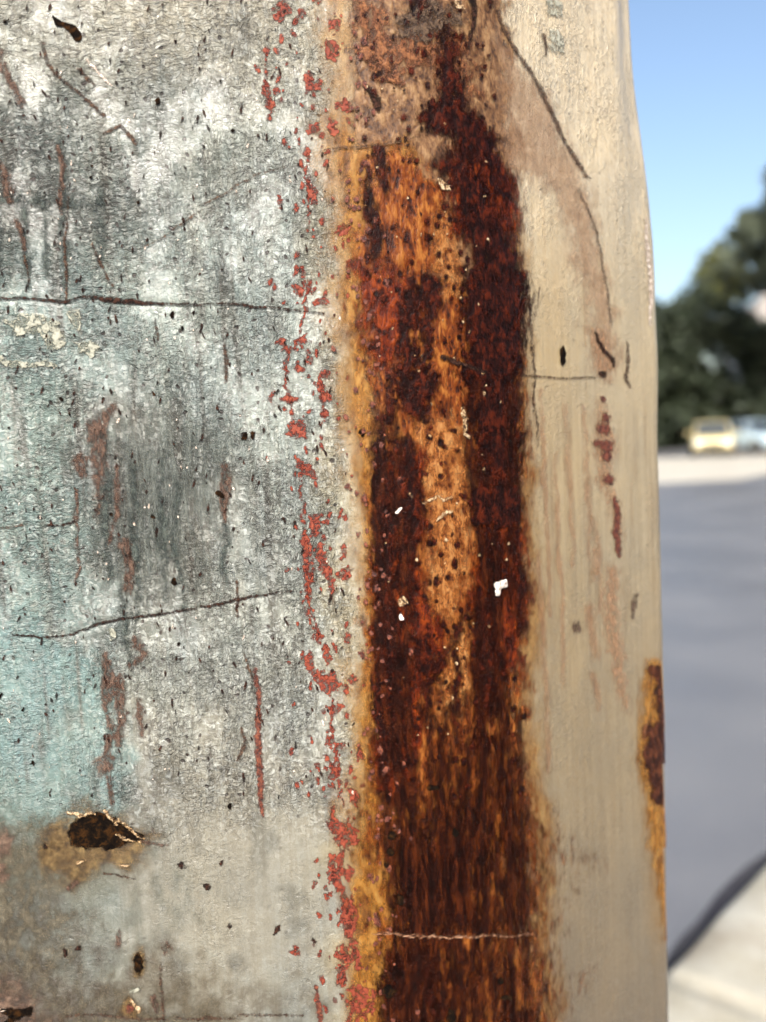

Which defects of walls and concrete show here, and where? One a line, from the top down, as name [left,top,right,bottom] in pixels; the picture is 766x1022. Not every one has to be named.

peeling [294,97,352,232]
crack [0,197,325,339]
peeling [275,280,330,439]
damp [73,454,88,477]
crack [12,578,292,639]
damp [157,461,185,612]
damp [219,478,231,583]
peeling [294,454,360,808]
rust [323,0,563,1022]
rust [593,396,622,558]
rust [636,659,667,939]
peeling [326,818,377,1022]